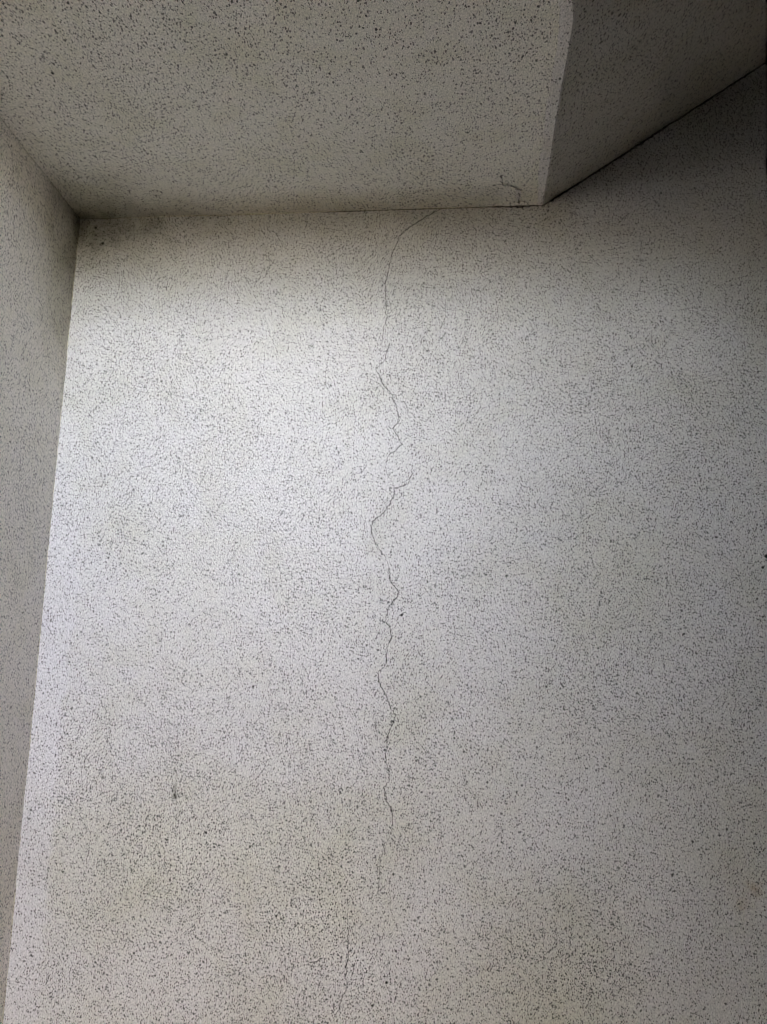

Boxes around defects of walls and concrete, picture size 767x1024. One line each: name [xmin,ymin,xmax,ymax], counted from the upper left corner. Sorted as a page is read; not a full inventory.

crack [322,62,767,892]
crack [309,901,349,1014]